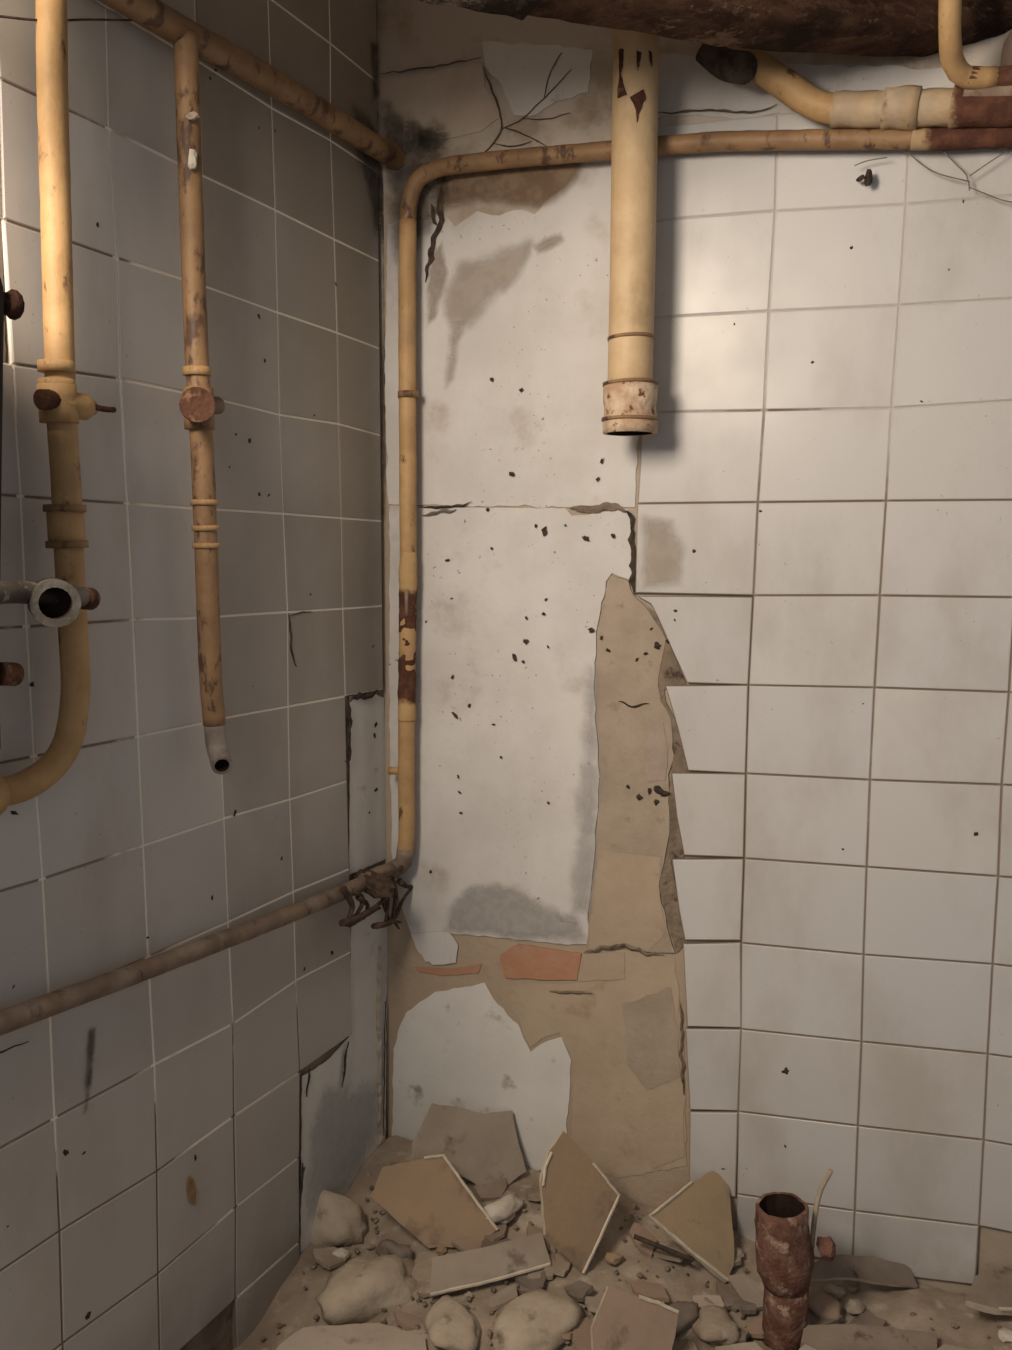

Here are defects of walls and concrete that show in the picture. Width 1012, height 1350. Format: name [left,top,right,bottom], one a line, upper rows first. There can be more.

crack [380,53,572,152]
corrosion [910,65,1012,151]
water stain [356,114,445,245]
water stain [416,163,579,238]
water stain [448,245,528,332]
peeling [300,160,734,1297]
water stain [449,769,591,938]
spalling [590,1287,679,1350]